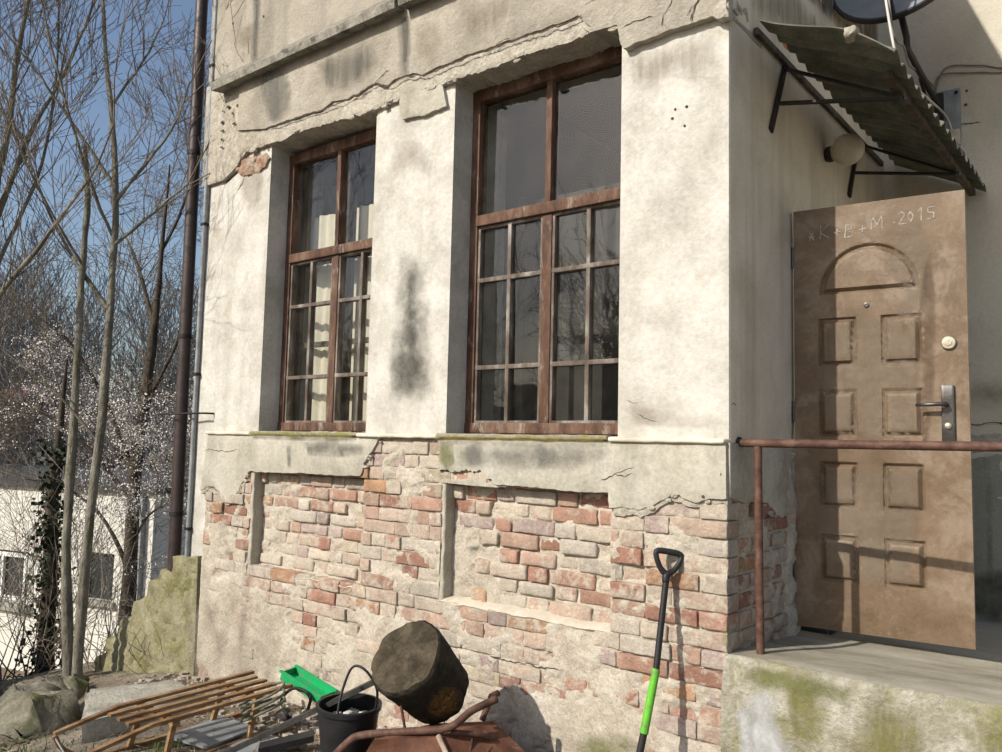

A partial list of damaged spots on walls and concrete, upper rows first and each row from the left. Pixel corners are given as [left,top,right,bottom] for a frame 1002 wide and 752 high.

flaking render [220,17,620,176]
crack [268,0,594,128]
crack [625,0,699,26]
damp [399,287,418,385]
flaking render [203,472,252,550]
flaking render [362,438,451,541]
flaking render [610,495,739,652]
damp [739,698,782,752]